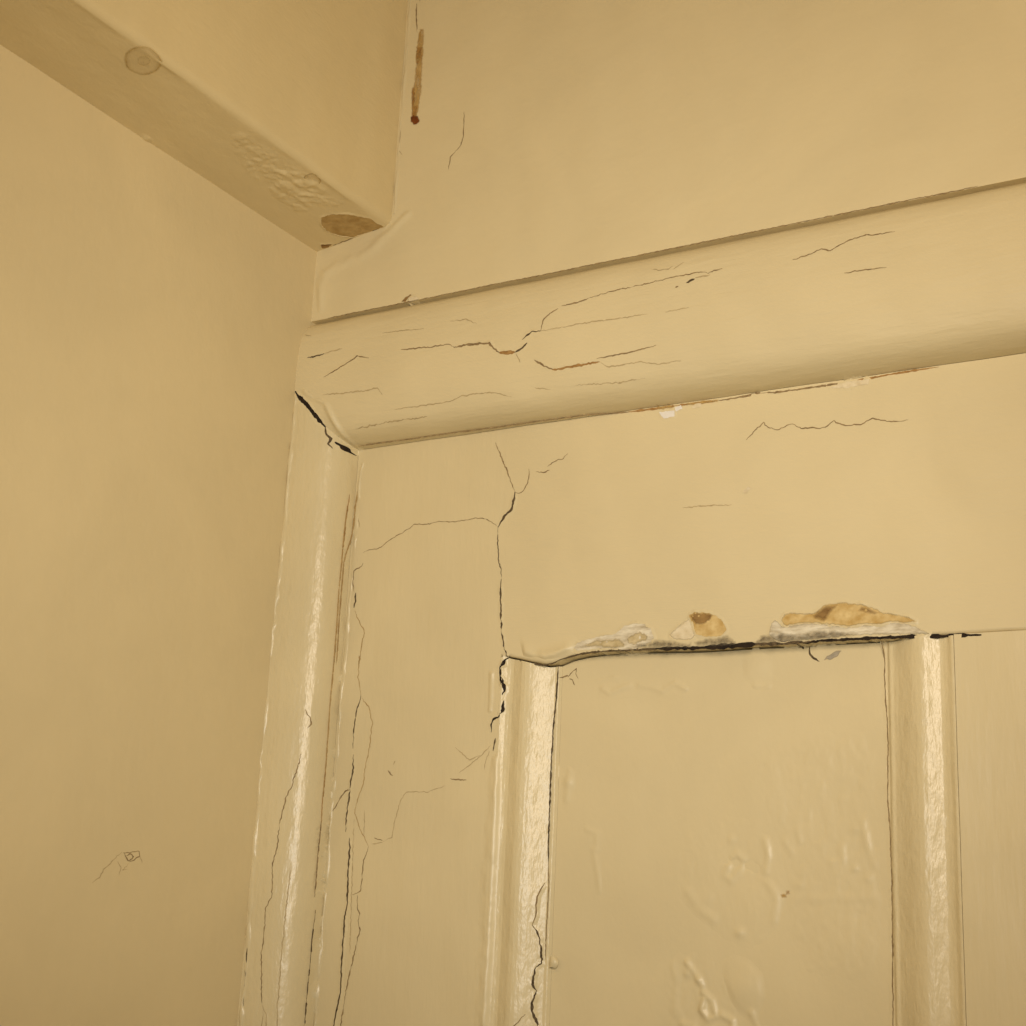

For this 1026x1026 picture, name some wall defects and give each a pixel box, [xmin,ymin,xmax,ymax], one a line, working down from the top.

rust [411,30,423,124]
peeling [318,212,386,249]
crack [330,186,977,390]
peeling [573,609,732,657]
peeling [759,599,932,659]
crack [244,335,937,1026]